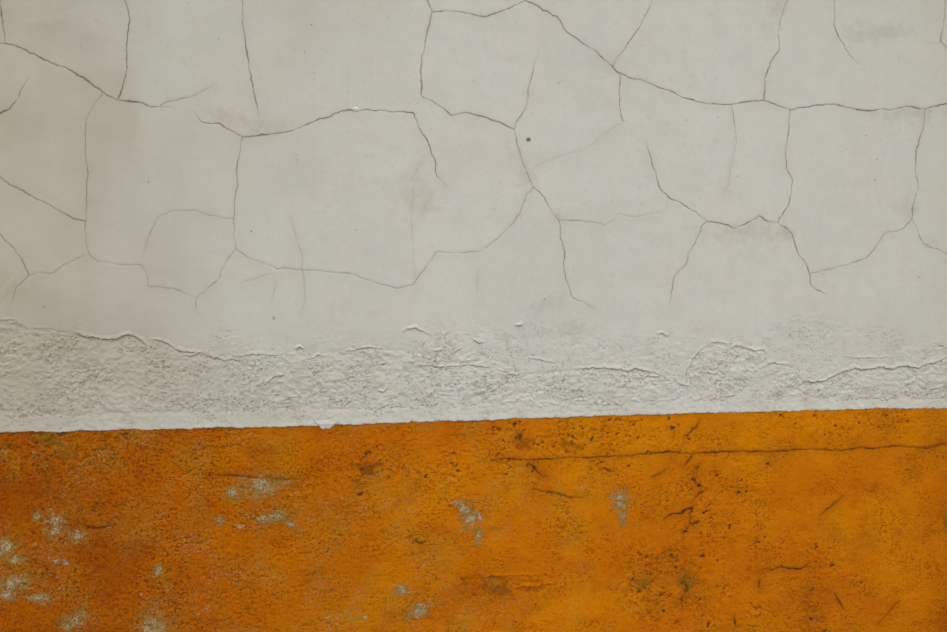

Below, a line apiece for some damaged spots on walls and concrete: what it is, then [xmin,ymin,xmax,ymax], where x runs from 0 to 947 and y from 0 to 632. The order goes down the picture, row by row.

crack [1,11,171,107]
flaking render [0,316,947,418]